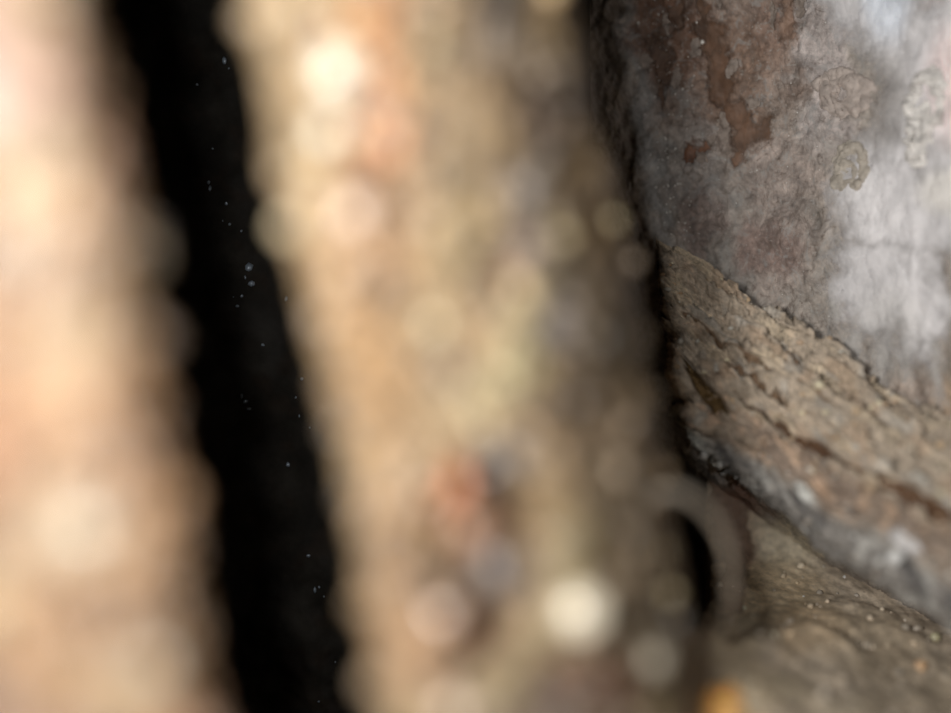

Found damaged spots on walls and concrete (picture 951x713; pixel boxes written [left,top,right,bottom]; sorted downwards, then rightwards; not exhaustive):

water stain [822,0,951,365]